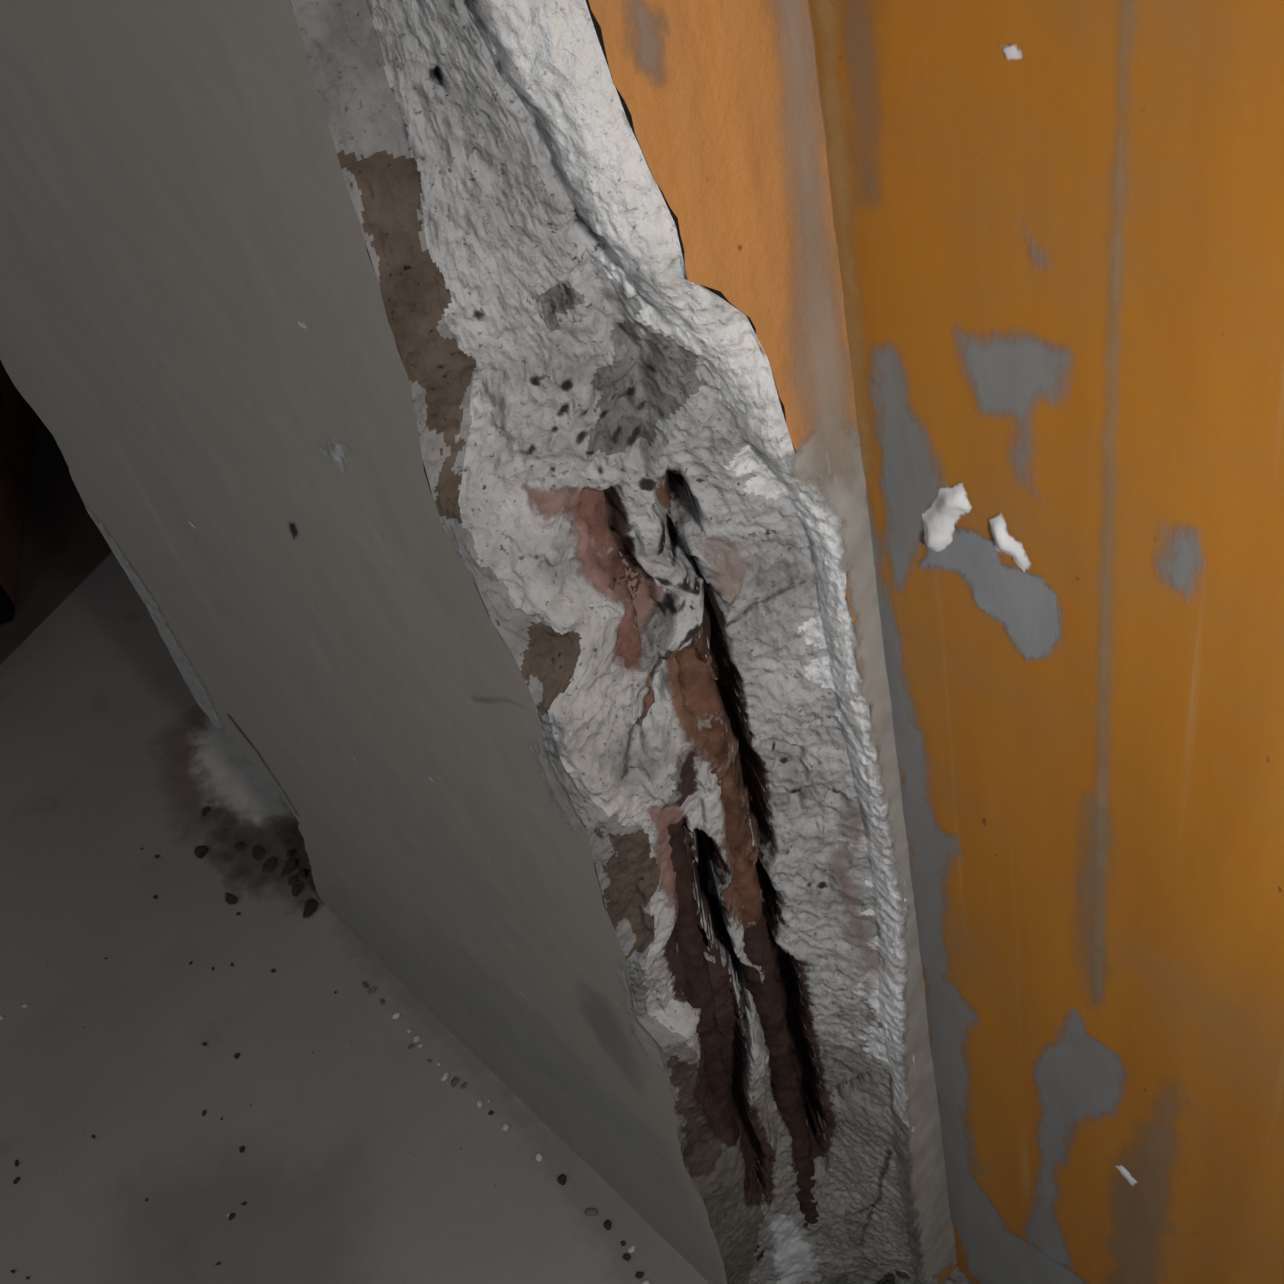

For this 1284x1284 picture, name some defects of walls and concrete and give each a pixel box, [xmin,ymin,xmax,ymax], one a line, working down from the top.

rust [522,485,664,671]
spalling [290,0,1124,1284]
rust [648,579,836,1207]
crack [725,582,804,627]